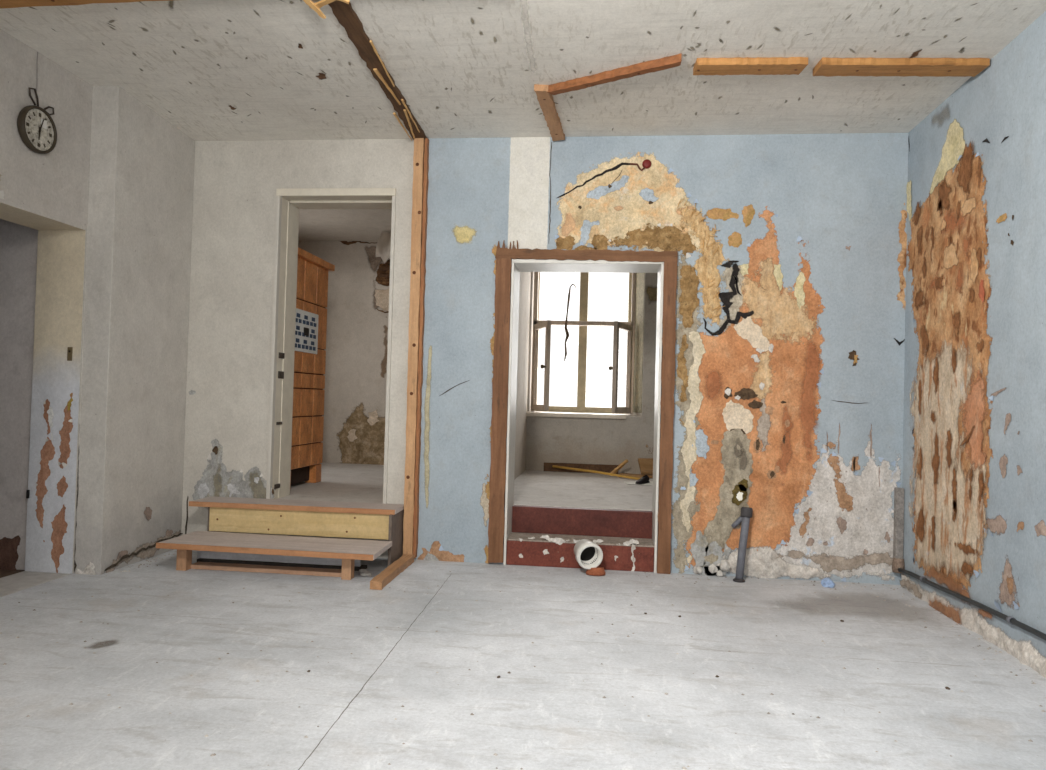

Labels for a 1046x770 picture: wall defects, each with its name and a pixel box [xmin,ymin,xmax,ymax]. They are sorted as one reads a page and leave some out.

crack [548,142,630,236]
flaking render [376,259,390,286]
crack [703,260,754,336]
peeling [555,119,1046,678]
peeling [35,393,73,573]
peeling [192,439,274,511]
peeling [0,535,21,570]
peeling [417,541,464,562]